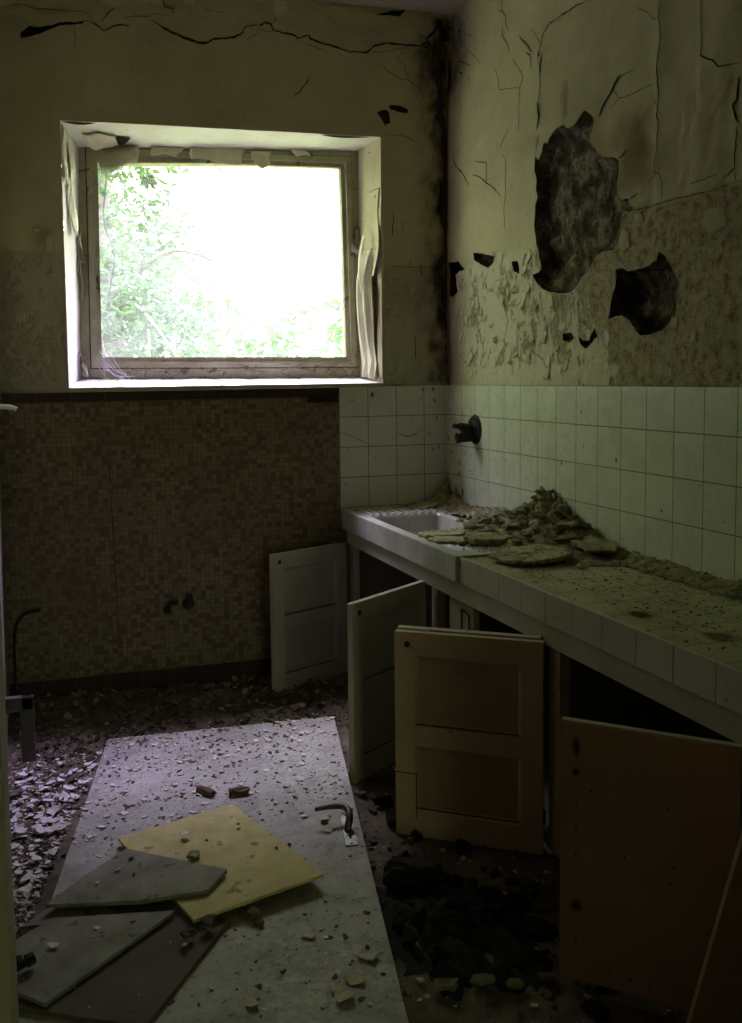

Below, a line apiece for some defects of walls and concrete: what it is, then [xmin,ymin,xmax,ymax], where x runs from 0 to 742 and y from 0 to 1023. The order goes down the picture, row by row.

peeling [60,121,271,301]
crack [0,0,586,226]
peeling [291,149,311,157]
spalling [377,104,408,127]
water stain [414,16,462,383]
spalling [448,261,465,297]
spalling [452,109,635,380]
spalling [608,252,680,337]
crack [598,0,742,225]